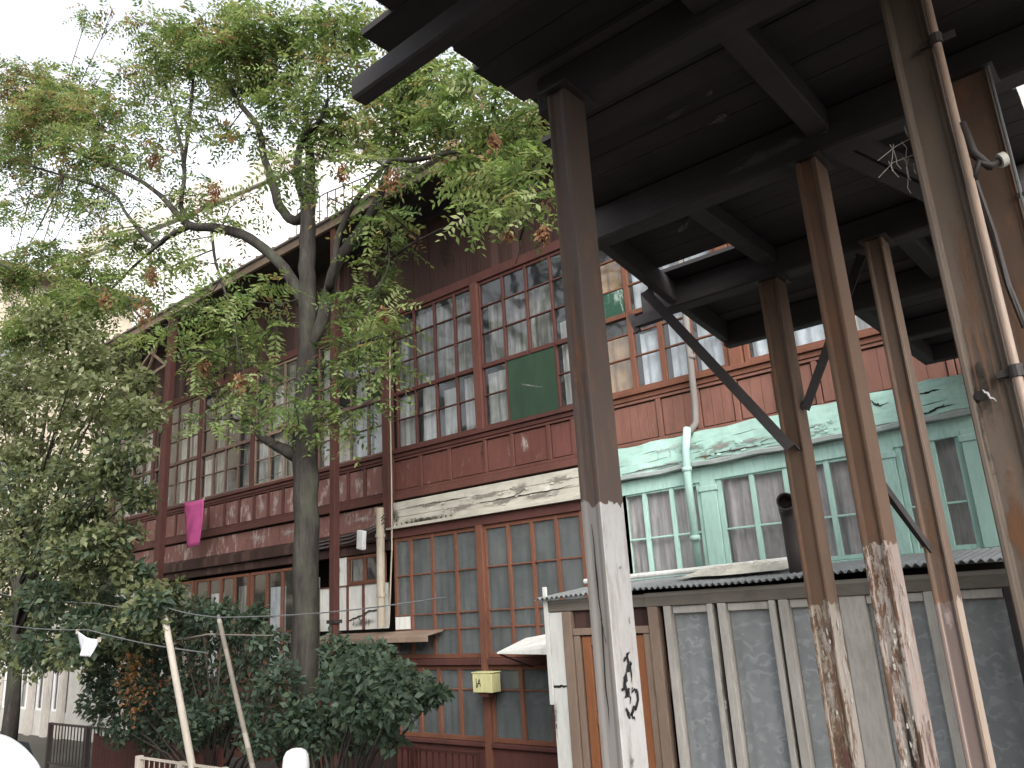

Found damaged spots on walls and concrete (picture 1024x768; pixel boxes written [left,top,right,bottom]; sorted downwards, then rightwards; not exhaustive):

crack [919,389,955,414]
peeling [638,436,773,472]
peeling [417,475,571,513]
peeling [821,619,853,717]
peeling [883,584,937,768]